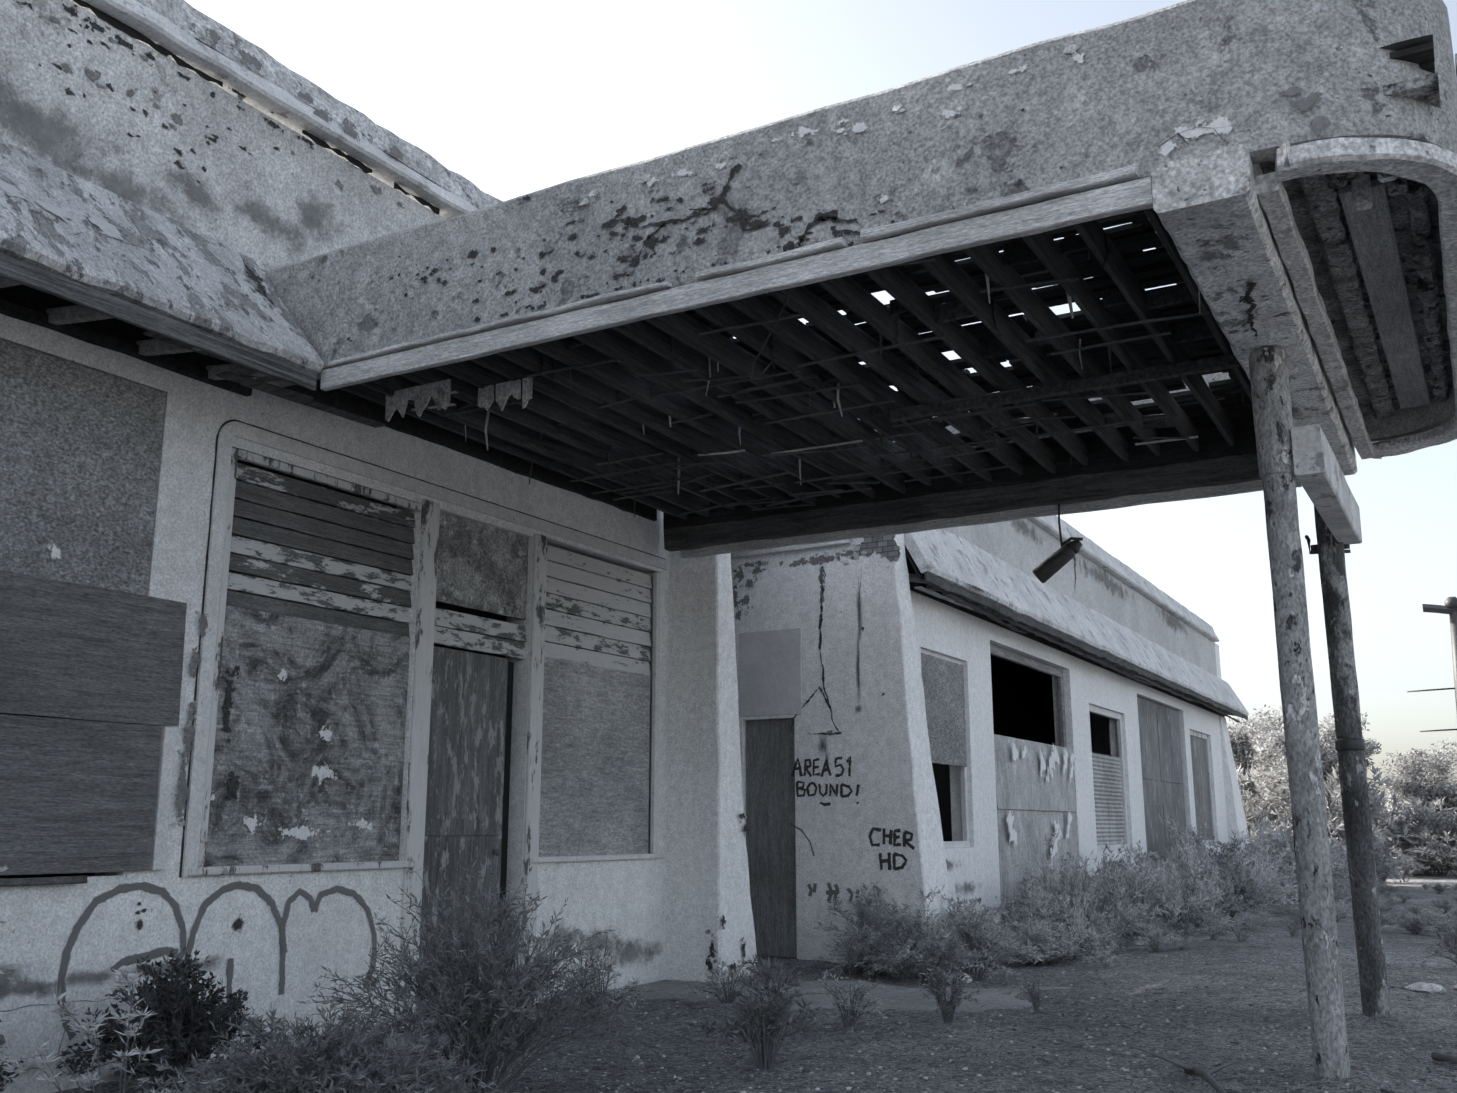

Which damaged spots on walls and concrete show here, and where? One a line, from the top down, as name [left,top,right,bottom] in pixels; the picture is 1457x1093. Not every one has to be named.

flaking render [17,0,253,183]
spalling [261,111,314,155]
peeling [298,91,360,142]
peeling [758,118,868,156]
peeling [0,175,128,242]
flaking render [467,162,810,322]
crack [633,163,862,268]
spalling [243,259,274,309]
flaking render [392,259,452,299]
crack [1239,282,1258,338]
flaking render [732,535,901,620]
crack [790,567,861,736]